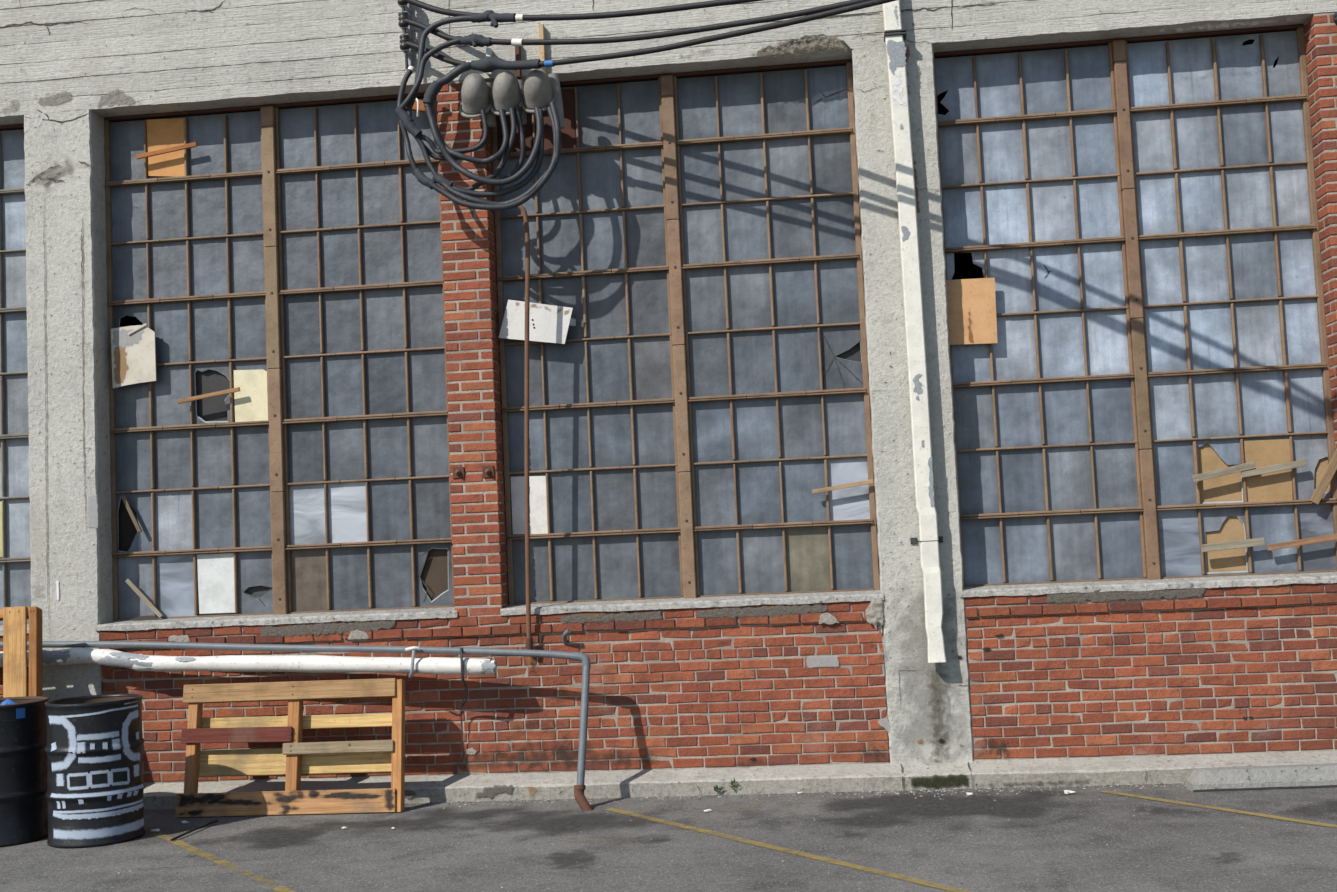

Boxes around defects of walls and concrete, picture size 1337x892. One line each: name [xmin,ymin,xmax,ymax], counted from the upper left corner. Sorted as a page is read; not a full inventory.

crack [0,0,88,35]
crack [121,1,224,19]
spalling [752,34,847,57]
peeling [38,91,72,106]